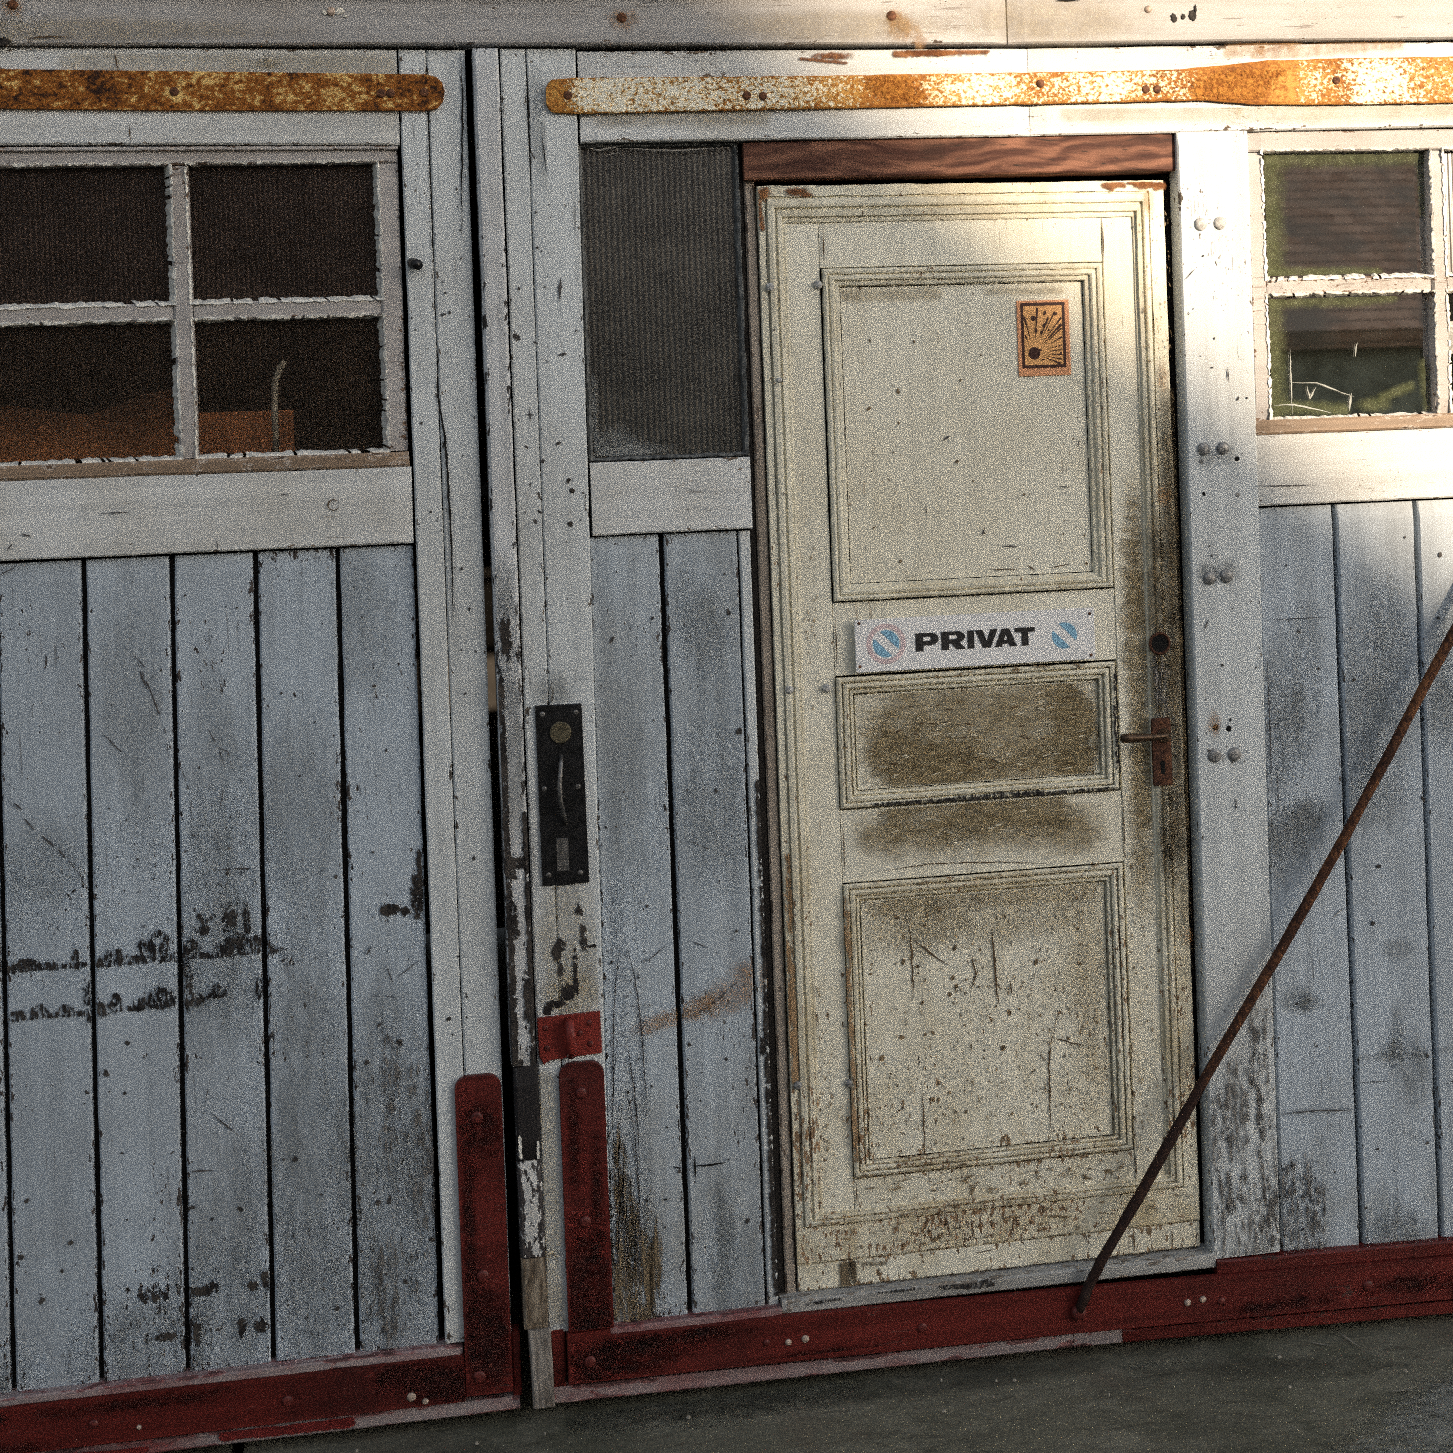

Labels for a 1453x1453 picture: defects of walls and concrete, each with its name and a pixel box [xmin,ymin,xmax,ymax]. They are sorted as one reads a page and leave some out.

corrosion [864,76,929,104]
corrosion [1192,70,1286,100]
damp [869,683,1097,786]
damp [1124,403,1190,883]
peeling [0,810,290,1024]
peeling [807,857,1193,1305]